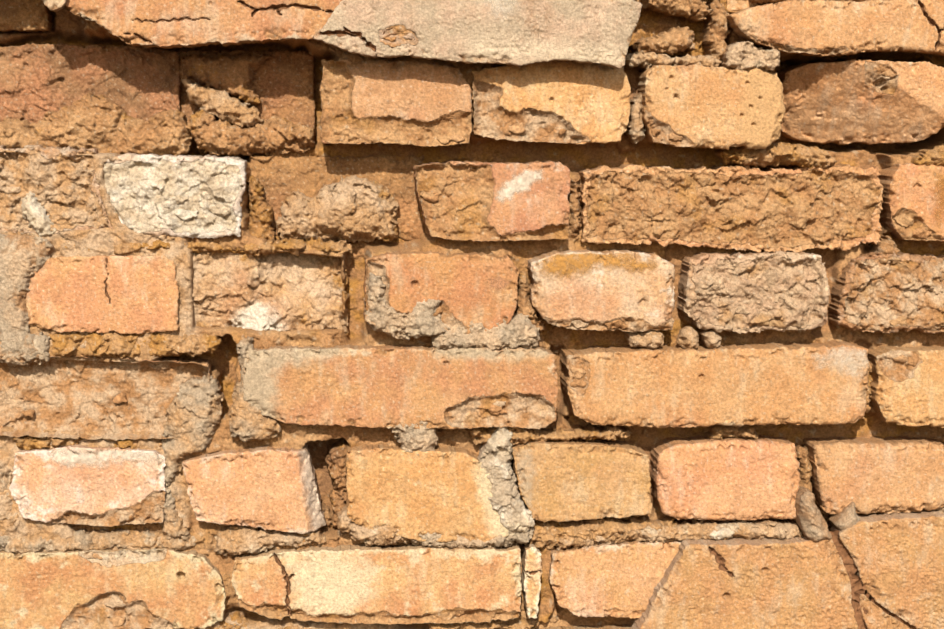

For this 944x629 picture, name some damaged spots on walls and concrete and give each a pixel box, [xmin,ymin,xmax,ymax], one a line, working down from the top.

crack [237,0,417,57]
crack [918,0,944,50]
spalling [0,149,242,233]
spalling [415,163,569,241]
spalling [585,169,881,331]
spalling [844,256,944,331]
spalling [0,356,210,441]
spalling [444,392,556,429]
spalling [49,490,166,527]
spalling [238,599,519,625]
flaking render [631,486,944,629]
crack [830,530,916,629]